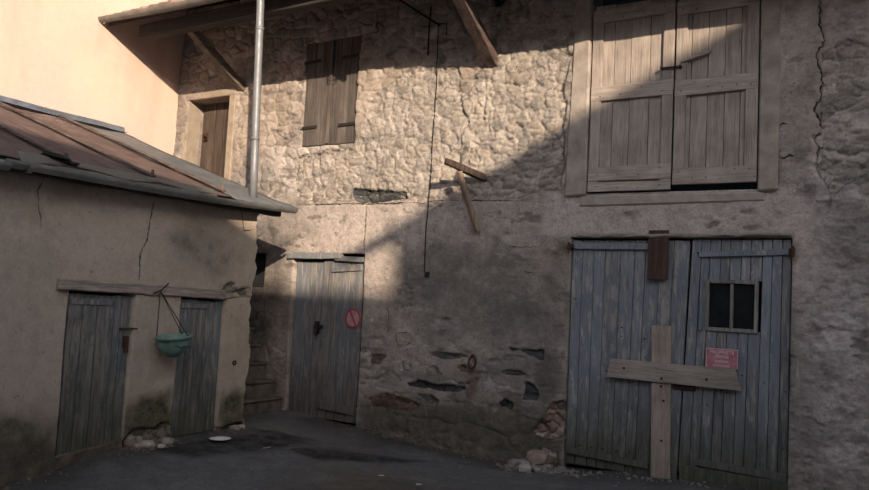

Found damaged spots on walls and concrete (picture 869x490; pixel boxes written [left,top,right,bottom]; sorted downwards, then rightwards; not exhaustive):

crack [813,0,838,178]
crack [139,199,155,279]